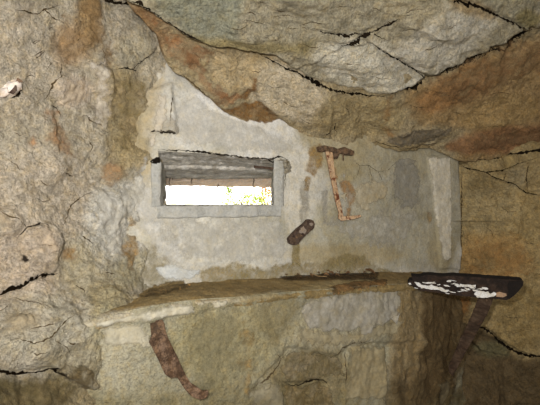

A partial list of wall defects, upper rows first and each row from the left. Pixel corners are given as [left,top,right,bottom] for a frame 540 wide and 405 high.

crack [105,0,393,97]
crack [229,2,471,115]
crack [441,0,532,73]
crack [461,148,540,262]
crack [0,273,57,311]
crack [0,368,67,377]
crack [284,378,328,386]
crack [480,327,540,358]